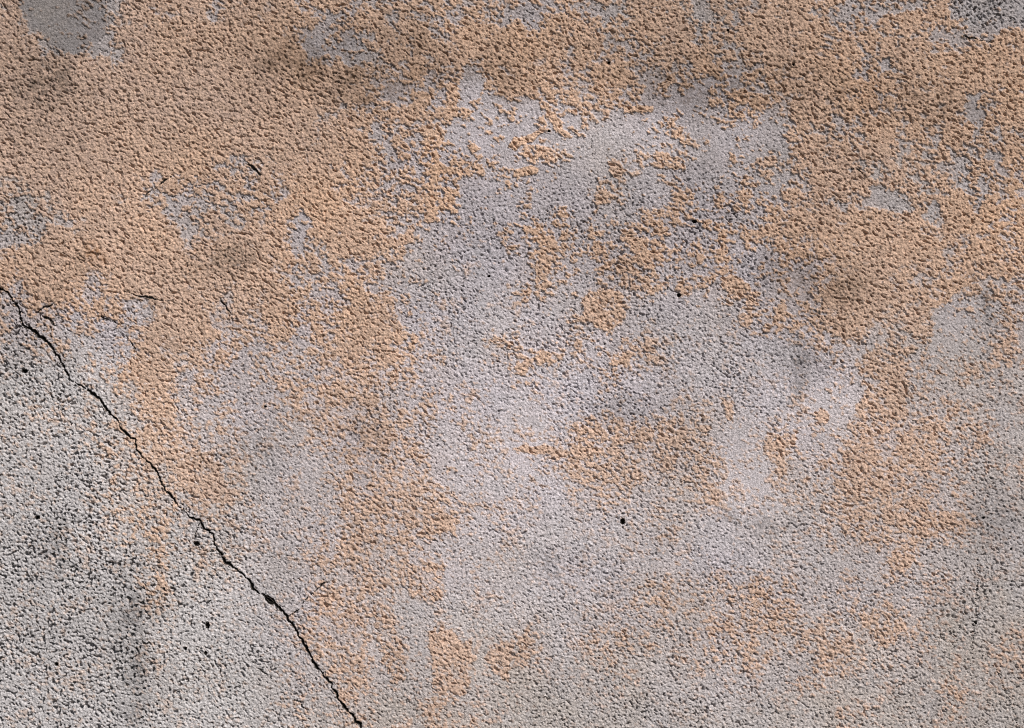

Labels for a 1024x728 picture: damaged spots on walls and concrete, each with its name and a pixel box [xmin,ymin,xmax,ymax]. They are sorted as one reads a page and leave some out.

peeling [135,160,277,234]
peeling [955,145,991,206]
peeling [291,201,310,279]
peeling [122,300,155,323]
peeling [384,76,957,634]
peeling [894,289,989,372]
spalling [0,312,324,728]
crack [0,288,362,728]
peeling [374,617,406,684]
peeling [428,626,515,697]